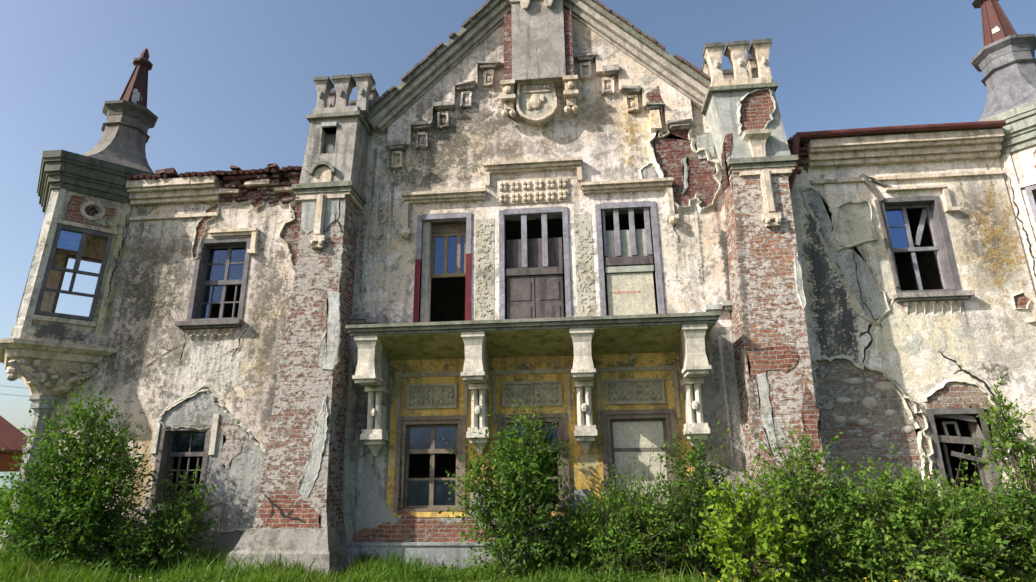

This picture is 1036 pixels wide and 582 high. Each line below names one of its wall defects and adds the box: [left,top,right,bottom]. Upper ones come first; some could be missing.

flaking render [638,86,732,214]
flaking render [191,171,302,270]
leakage [802,202,858,364]
crack [799,187,895,366]
leakage [884,180,1031,297]
crack [1008,177,1036,277]
crack [144,325,254,418]
flaking render [158,389,320,535]
flaking render [352,448,676,542]
flaking render [745,344,798,380]
flaking render [801,354,1030,485]
crack [939,350,1034,440]